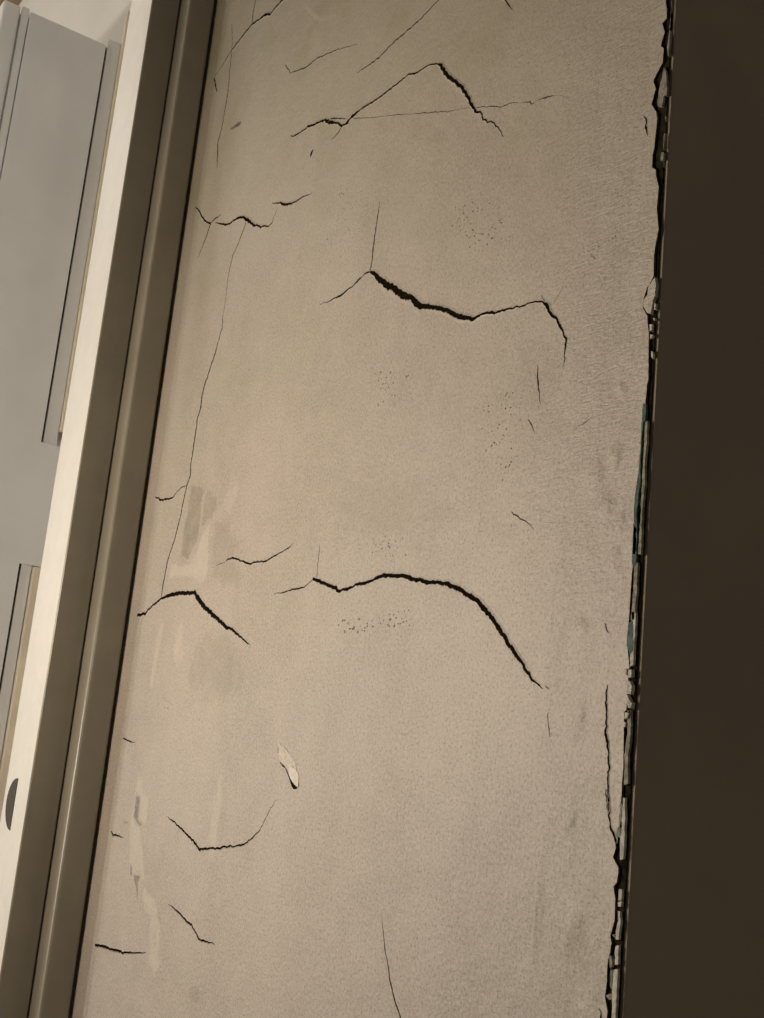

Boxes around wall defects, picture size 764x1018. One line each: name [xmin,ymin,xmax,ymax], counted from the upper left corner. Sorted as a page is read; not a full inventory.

crack [214,0,284,165]
crack [290,61,569,140]
crack [320,202,568,366]
crack [137,194,310,645]
flaking render [606,0,671,1018]
crack [274,545,550,737]
crack [168,800,276,853]
flaking render [278,743,299,789]
crack [603,685,618,844]
crack [95,942,146,956]
crack [168,904,215,945]
crack [382,916,402,1018]